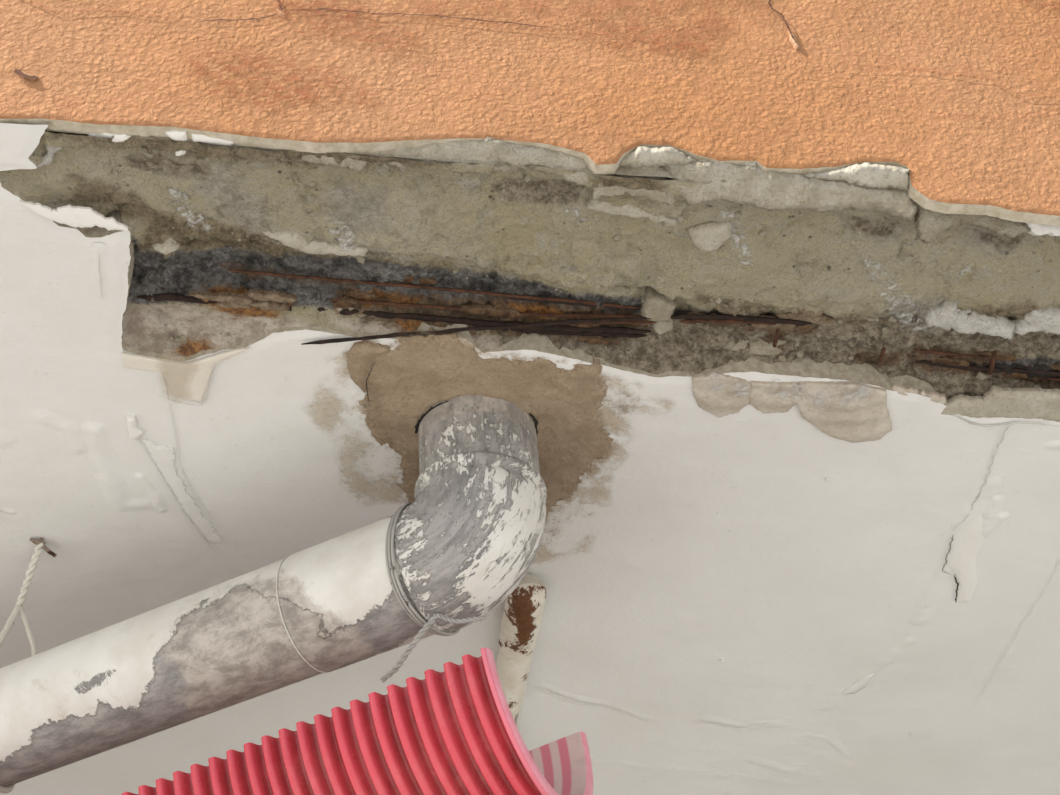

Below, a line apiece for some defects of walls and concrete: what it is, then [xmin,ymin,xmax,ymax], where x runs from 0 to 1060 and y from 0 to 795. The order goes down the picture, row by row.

crack [31,0,575,31]
crack [768,0,800,51]
flaking render [15,68,39,81]
spalling [0,129,1060,443]
crack [908,420,1015,626]